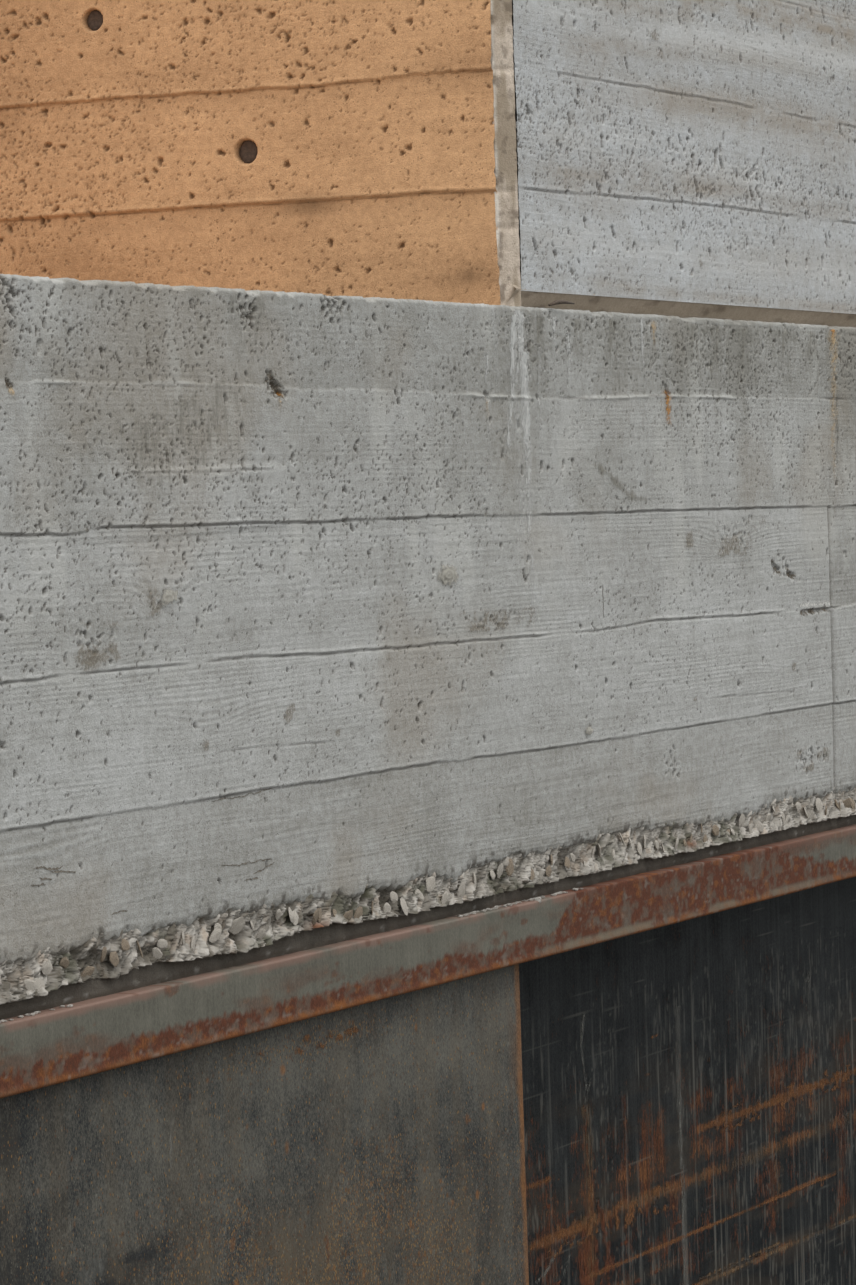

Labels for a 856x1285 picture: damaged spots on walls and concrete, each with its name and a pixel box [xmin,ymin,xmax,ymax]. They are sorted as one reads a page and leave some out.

spalling [0,786,856,1005]
damp [675,1006,687,1285]
corrosion [530,1159,854,1285]